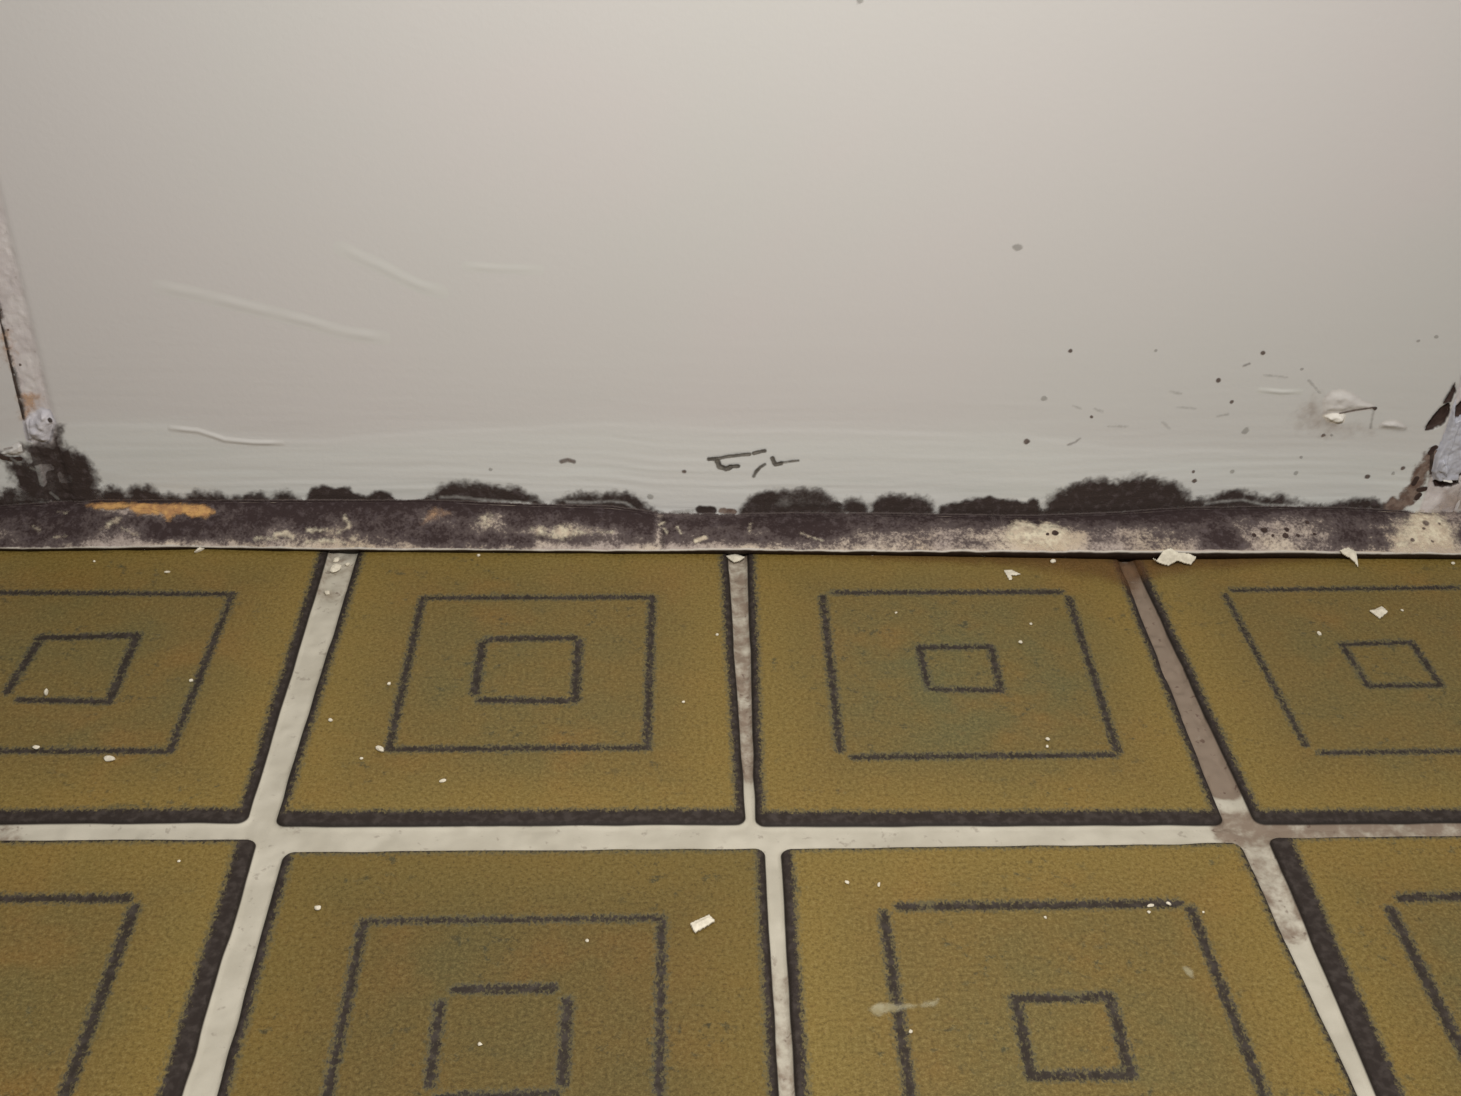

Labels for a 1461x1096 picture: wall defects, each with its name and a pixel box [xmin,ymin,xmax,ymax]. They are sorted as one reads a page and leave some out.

damp [0,426,1438,552]
damp [1440,496,1461,547]